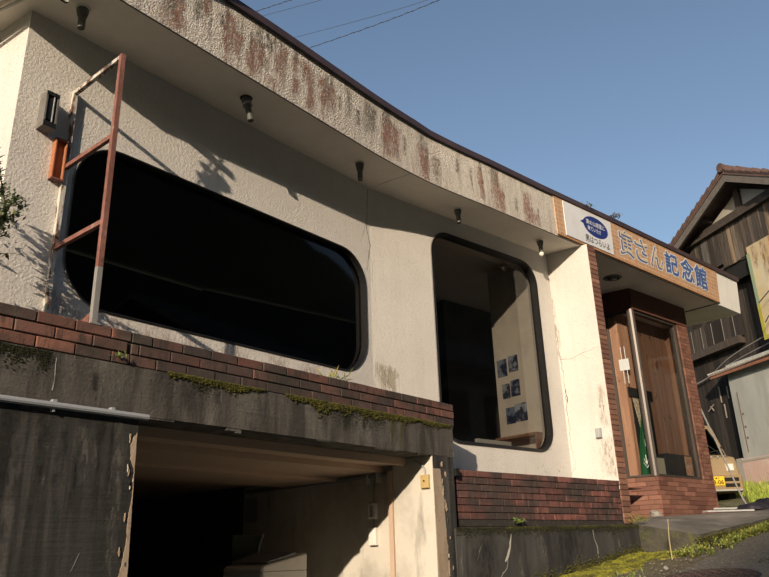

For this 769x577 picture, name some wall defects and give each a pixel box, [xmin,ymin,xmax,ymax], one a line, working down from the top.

corrosion [223,3,265,72]
corrosion [268,40,335,111]
corrosion [381,109,399,158]
corrosion [419,135,430,177]
corrosion [477,162,505,210]
peeling [118,434,137,577]